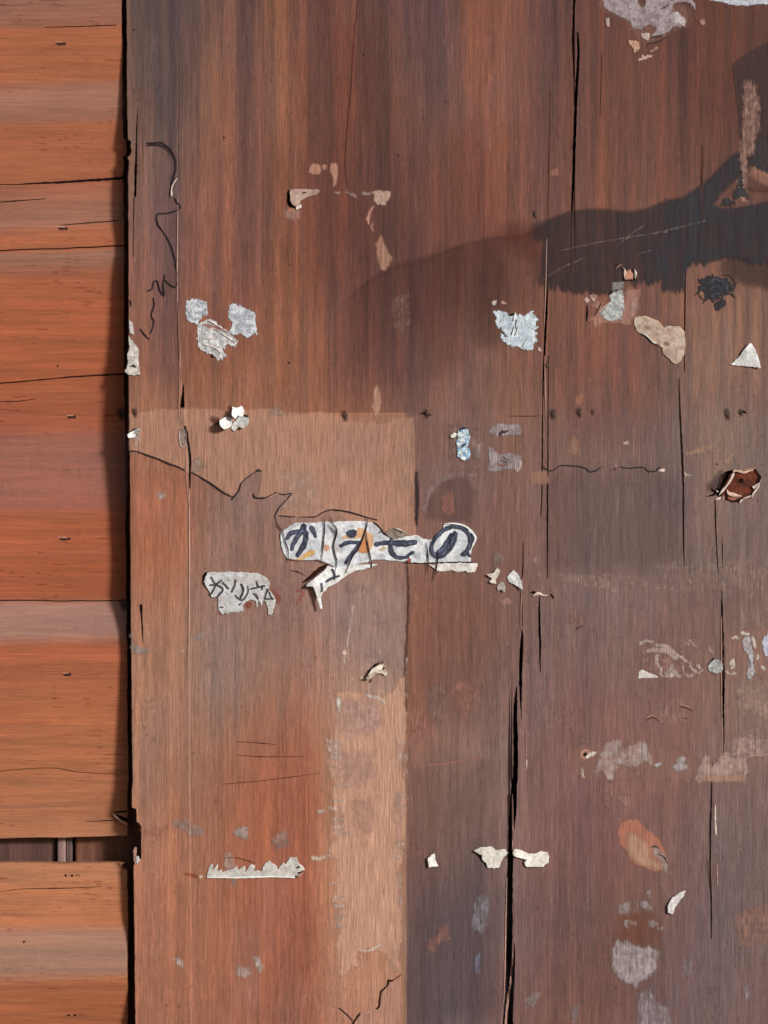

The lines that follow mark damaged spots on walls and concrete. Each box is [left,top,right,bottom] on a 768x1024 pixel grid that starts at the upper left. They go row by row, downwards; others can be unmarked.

peeling [602,0,706,61]
crack [548,0,602,217]
water stain [537,43,768,296]
peeling [185,298,258,361]
peeling [492,300,542,351]
spalling [708,468,762,503]
crack [503,245,686,1024]